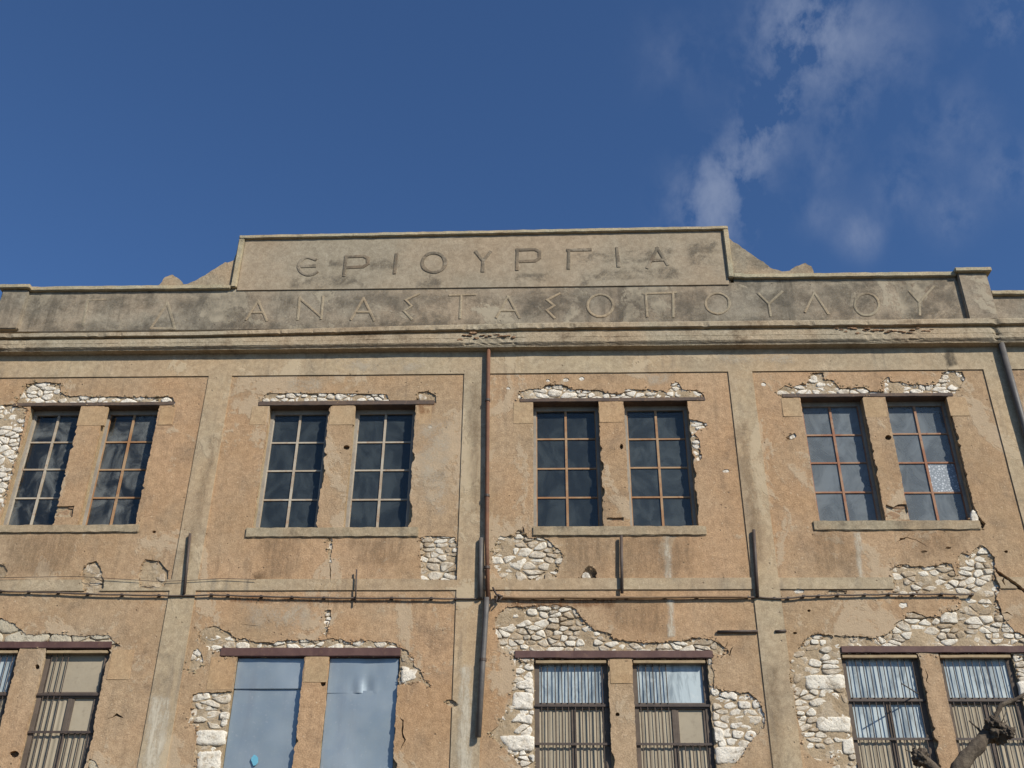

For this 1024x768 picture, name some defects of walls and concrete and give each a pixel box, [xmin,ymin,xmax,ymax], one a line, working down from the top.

flaking render [259,389,389,403]
flaking render [506,377,704,401]
flaking render [761,370,965,396]
flaking render [0,380,175,510]
flaking render [690,420,709,462]
flaking render [417,536,458,580]
flaking render [489,528,566,581]
flaking render [0,618,120,650]
flaking render [183,609,432,688]
flaking render [789,545,1024,768]
flaking render [488,602,767,768]
flaking render [185,690,232,768]